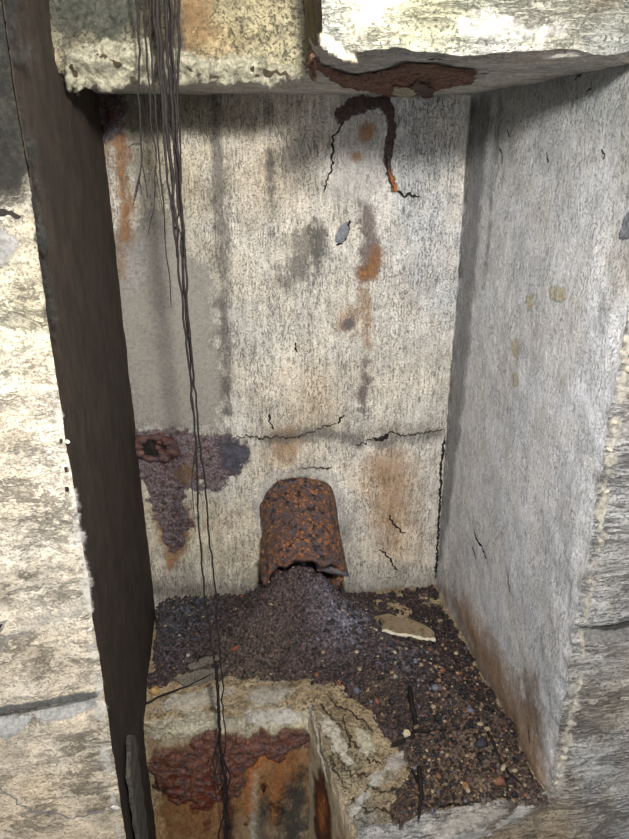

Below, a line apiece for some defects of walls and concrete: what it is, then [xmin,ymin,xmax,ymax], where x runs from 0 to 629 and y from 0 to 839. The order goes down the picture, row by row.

rust [303,53,477,98]
rust [98,94,133,266]
rust [357,207,381,281]
spalling [619,212,629,240]
rust [358,361,370,412]
spalling [617,336,629,403]
crack [235,414,345,440]
crack [356,429,446,579]
spalling [595,417,623,565]
spalling [305,704,327,781]
spalling [554,676,584,791]
rust [148,728,331,839]